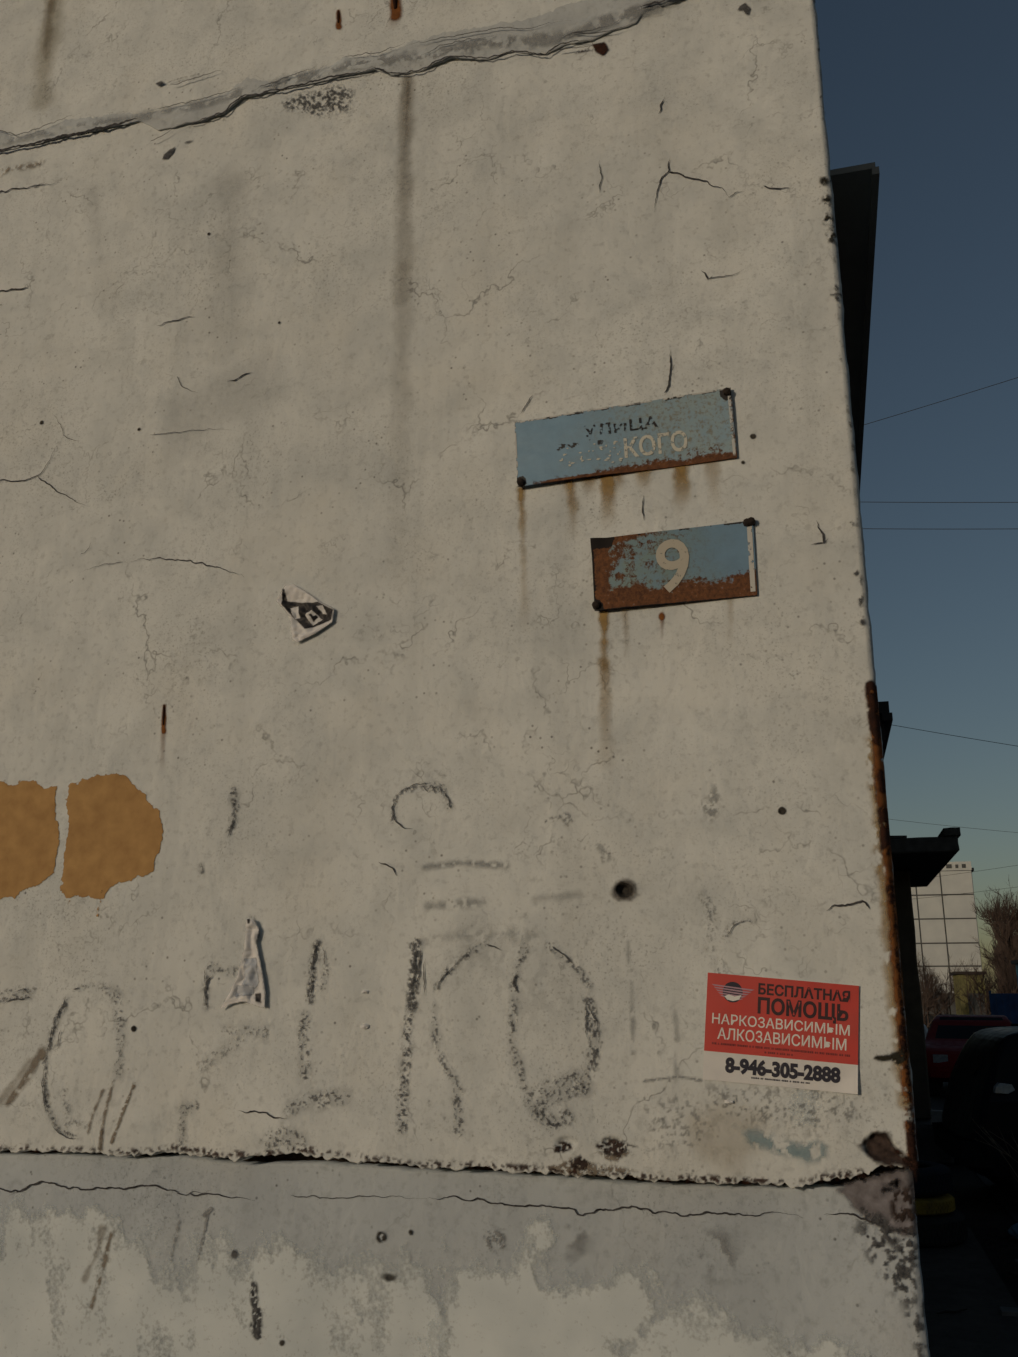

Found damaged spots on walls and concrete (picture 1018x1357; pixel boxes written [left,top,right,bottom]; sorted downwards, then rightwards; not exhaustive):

rust [390,0,401,20]
crack [654,162,788,208]
crack [1,413,82,504]
rust [865,680,919,1170]
spalling [874,1048,906,1064]
crack [0,1180,255,1201]
crack [292,1195,913,1235]
spalling [810,1131,925,1357]